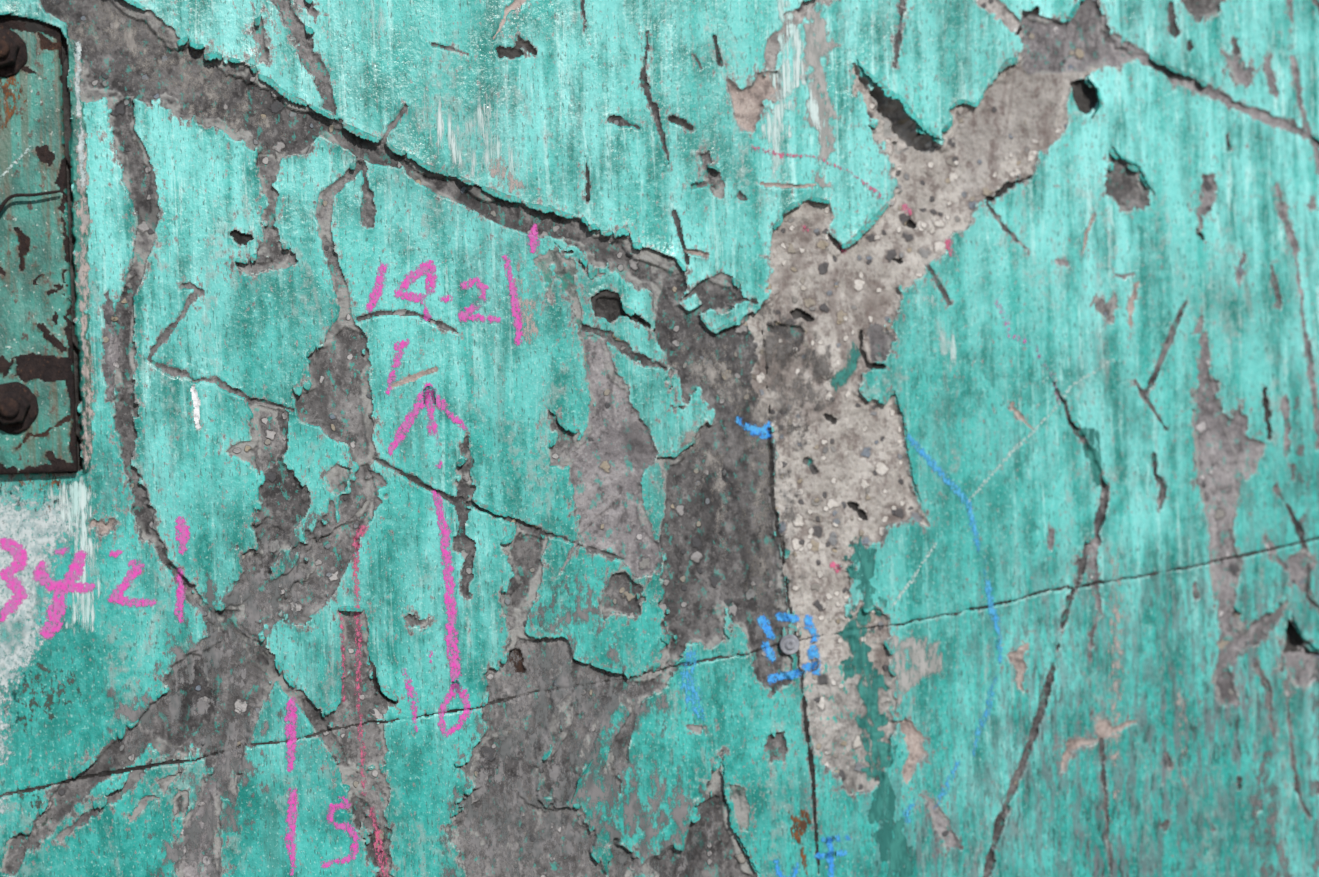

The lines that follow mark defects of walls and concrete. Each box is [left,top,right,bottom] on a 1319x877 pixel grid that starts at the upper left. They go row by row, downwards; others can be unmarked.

rust [0,66,36,128]
rust [0,17,63,90]
rust [0,144,91,492]
crack [270,0,343,126]
peeling [0,0,687,877]
crack [0,95,840,877]
spalling [446,0,1140,877]
crack [860,381,1319,877]
peeling [1104,144,1156,211]
peeling [1167,0,1224,52]
crack [1103,31,1319,147]
peeling [1191,315,1319,818]